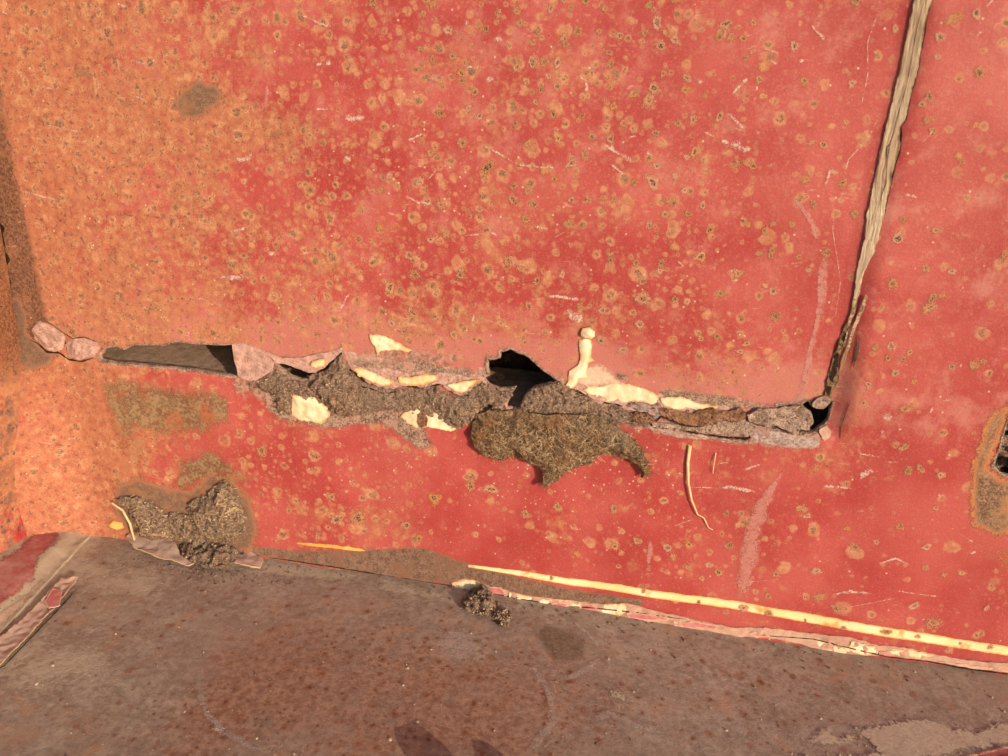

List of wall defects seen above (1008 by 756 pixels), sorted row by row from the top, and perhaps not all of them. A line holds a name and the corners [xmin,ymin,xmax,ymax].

crack [875,1,933,219]
peeling [32,321,101,360]
peeling [369,334,412,355]
peeling [291,394,330,424]
peeling [354,367,482,394]
peeling [401,407,456,432]
peeling [646,426,831,449]
crack [824,323,860,439]
rust [969,403,1008,538]
peeling [0,532,59,603]
rust [252,521,646,606]
peeling [0,577,78,665]